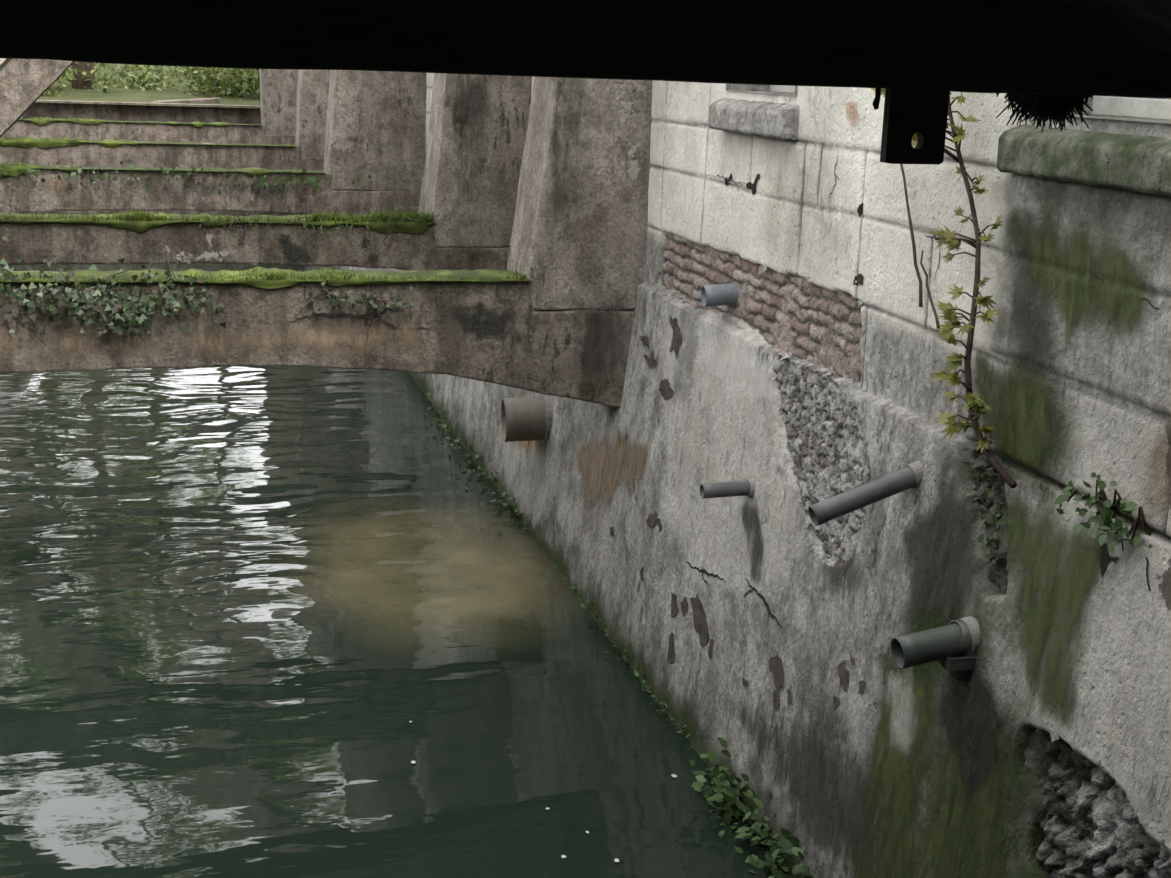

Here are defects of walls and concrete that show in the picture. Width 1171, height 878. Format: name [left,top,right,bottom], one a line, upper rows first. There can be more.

peeling [640,335,658,367]
flaking render [659,233,869,561]
crack [686,561,782,627]
leakage [940,678,999,833]
flaking render [1023,728,1171,878]